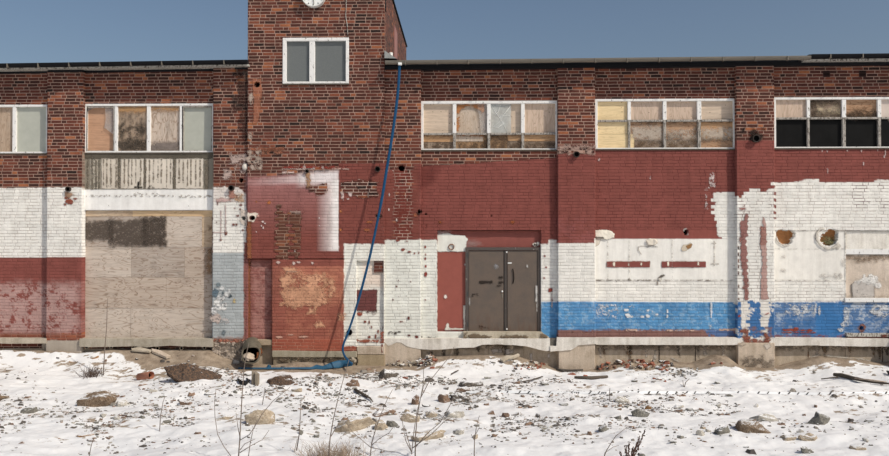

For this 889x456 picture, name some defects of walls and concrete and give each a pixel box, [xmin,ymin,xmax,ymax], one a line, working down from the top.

peeling [306,183,328,195]
peeling [340,179,390,200]
peeling [213,200,336,328]
peeling [739,208,749,300]
peeling [760,217,789,300]
peeling [710,302,771,343]
peeling [786,304,821,316]
peeling [870,305,889,317]